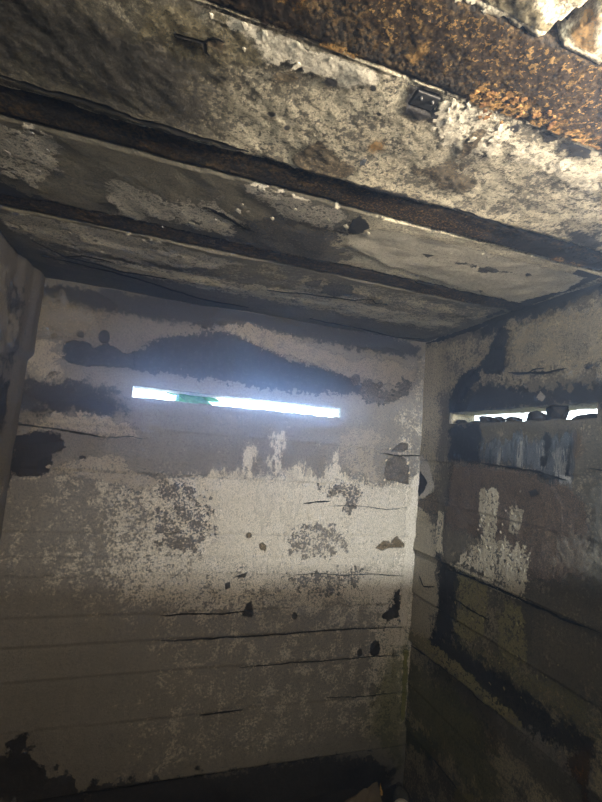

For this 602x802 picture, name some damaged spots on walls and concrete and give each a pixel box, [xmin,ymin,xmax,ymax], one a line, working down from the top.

corrosion [351,0,602,136]
peeling [0,123,67,190]
peeling [293,141,367,179]
peeling [410,81,602,197]
peeling [103,179,370,238]
peeling [0,212,478,328]
damp [8,430,66,488]
peeling [125,468,221,559]
peeling [281,521,370,598]
peeling [317,480,365,515]
peeling [376,536,405,551]
peeling [382,426,593,626]